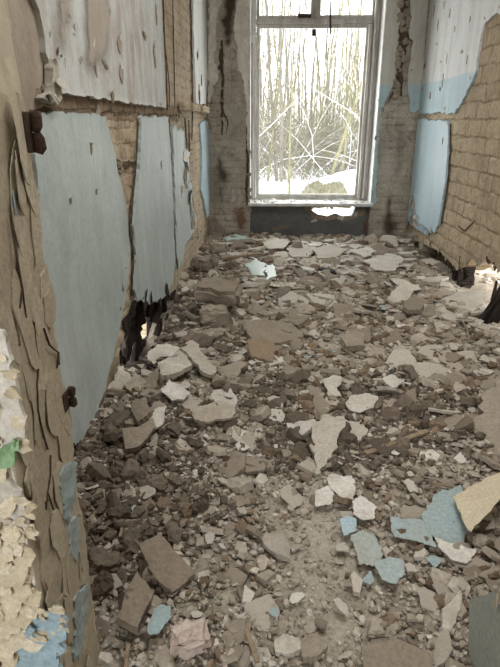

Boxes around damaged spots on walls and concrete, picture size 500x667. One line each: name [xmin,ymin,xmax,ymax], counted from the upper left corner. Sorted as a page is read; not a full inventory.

crack [213,40,229,135]
crack [388,0,413,102]
spalling [368,6,500,273]
peeling [0,0,253,667]